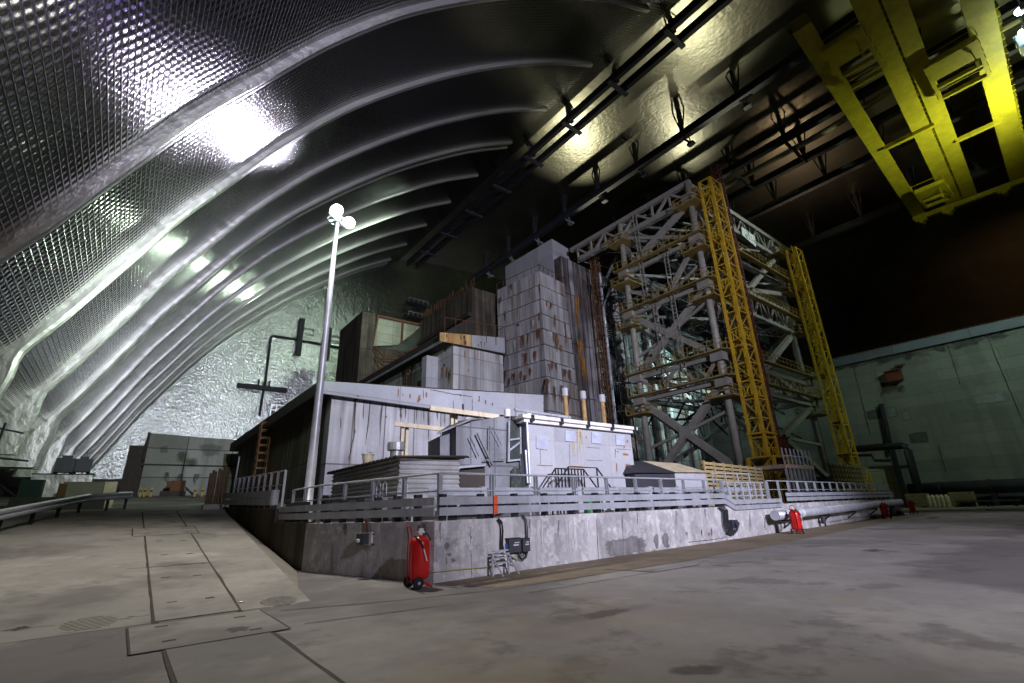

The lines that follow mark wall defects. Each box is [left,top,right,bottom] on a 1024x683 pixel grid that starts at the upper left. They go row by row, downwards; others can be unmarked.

rust [503,285,587,403]